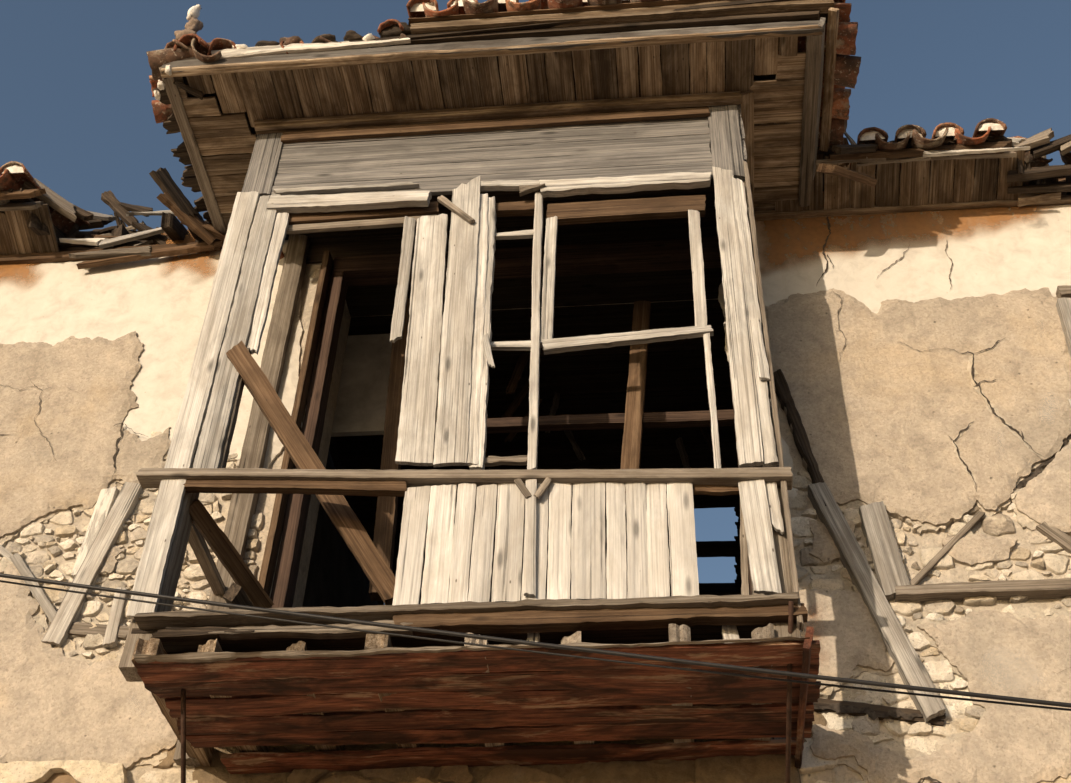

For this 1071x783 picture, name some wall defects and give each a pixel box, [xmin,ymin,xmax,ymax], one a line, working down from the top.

crack [816,216,846,355]
leakage [760,190,1049,271]
crack [2,379,80,459]
crack [900,339,1071,501]
spalling [0,504,96,633]
spalling [52,488,159,666]
spalling [171,542,211,611]
spalling [198,493,233,532]
spalling [244,513,264,577]
spalling [788,471,858,601]
spalling [887,462,1071,585]
spalling [127,596,1071,783]